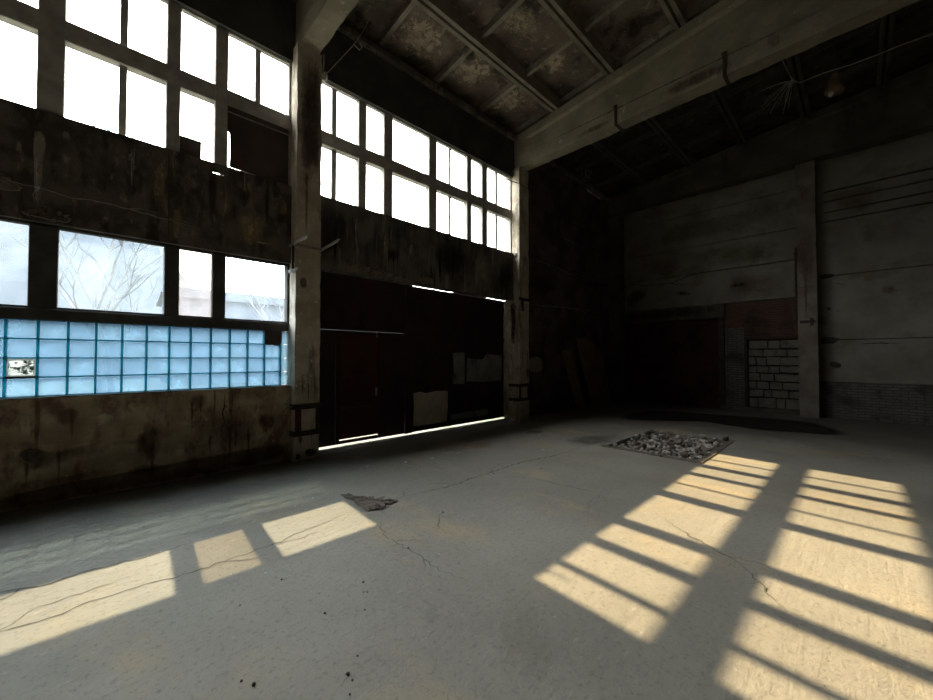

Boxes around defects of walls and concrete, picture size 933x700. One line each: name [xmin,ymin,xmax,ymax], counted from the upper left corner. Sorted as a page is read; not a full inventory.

leakage [4,422,283,506]
crack [0,507,362,632]